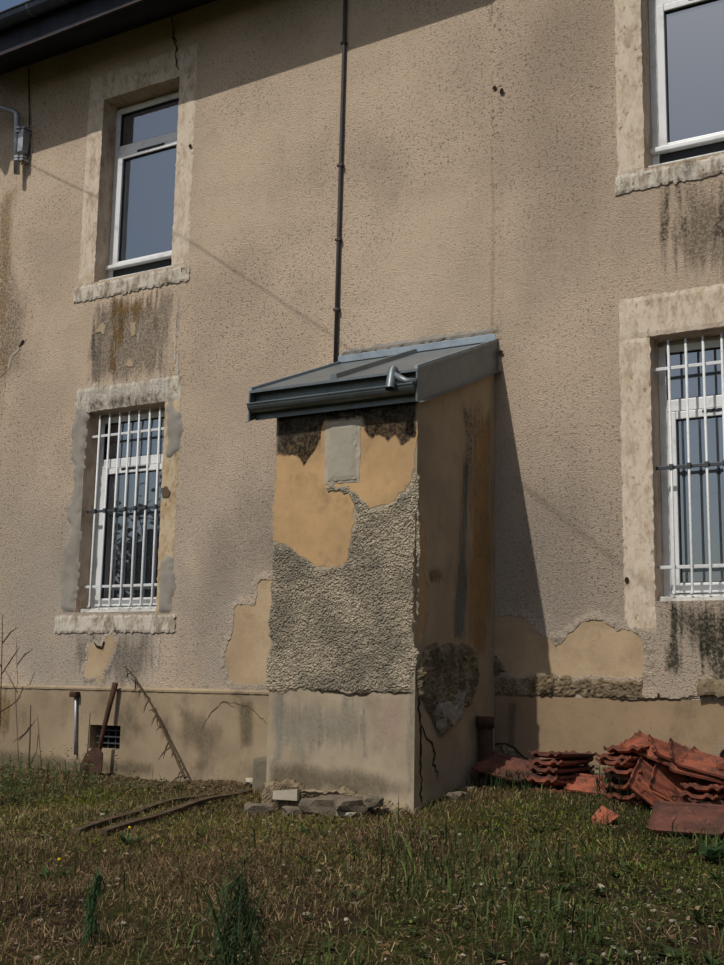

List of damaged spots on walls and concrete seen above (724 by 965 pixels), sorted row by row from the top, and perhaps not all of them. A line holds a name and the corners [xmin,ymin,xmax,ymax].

crack [171,17,179,69]
leakage [661,194,724,261]
leakage [79,297,179,409]
peeling [272,421,418,568]
peeling [81,632,119,687]
peeling [217,570,272,690]
spalling [411,502,480,738]
peeling [493,605,657,696]
leakage [667,613,682,671]
leakage [700,611,724,665]